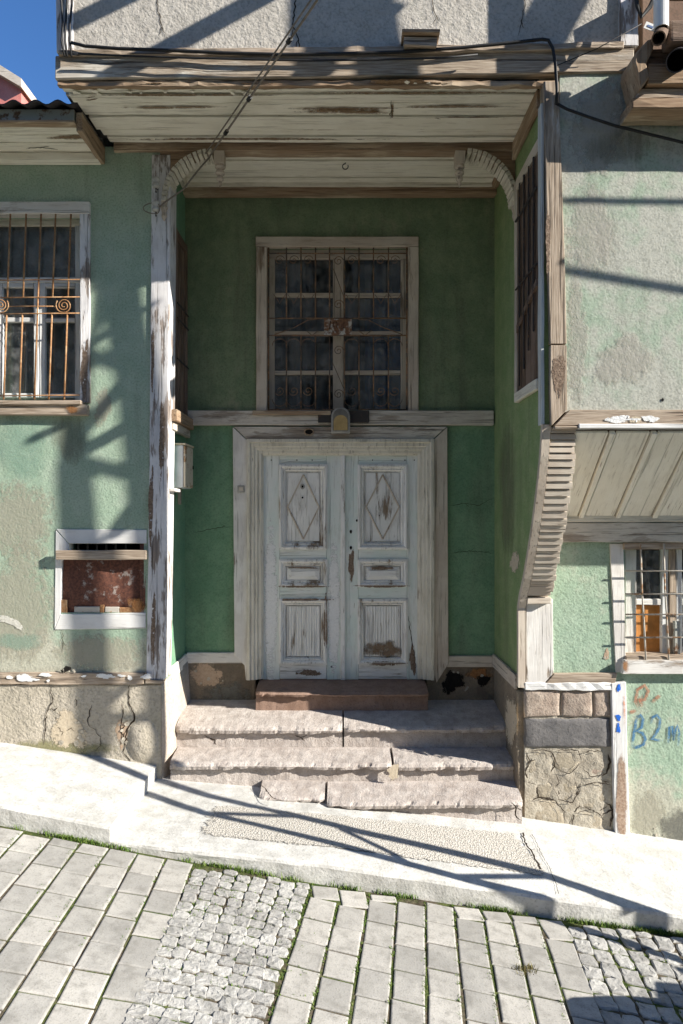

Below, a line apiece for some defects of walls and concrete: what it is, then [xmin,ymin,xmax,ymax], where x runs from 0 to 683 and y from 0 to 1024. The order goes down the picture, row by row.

peeling [551,355,566,399]
peeling [148,333,165,547]
rust [62,544,146,613]
peeling [189,663,224,687]
peeling [364,641,416,675]
spalling [442,670,490,695]
crack [43,684,135,761]